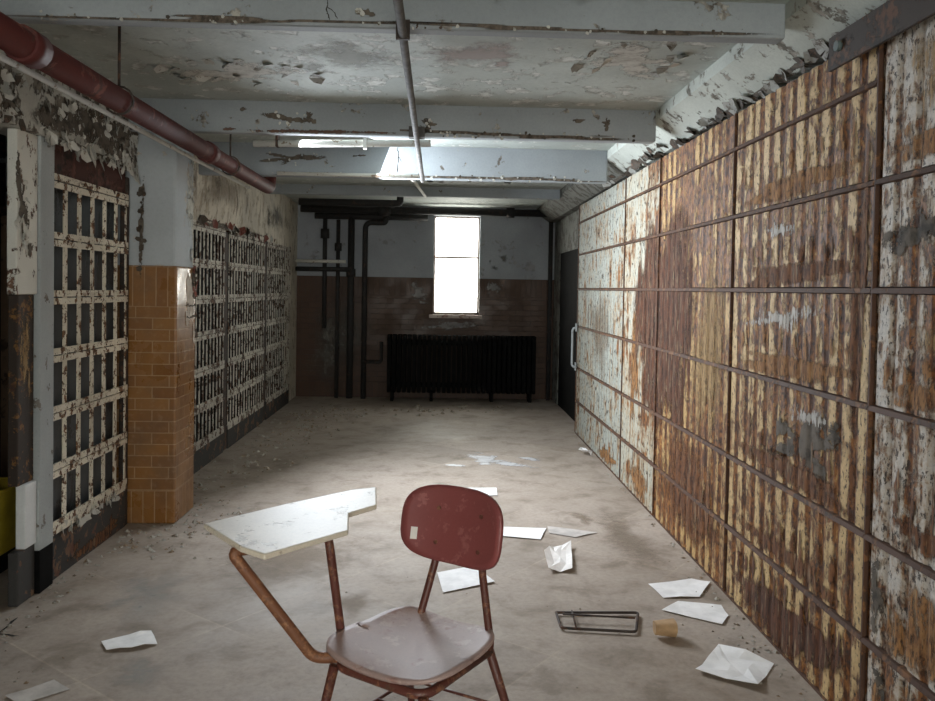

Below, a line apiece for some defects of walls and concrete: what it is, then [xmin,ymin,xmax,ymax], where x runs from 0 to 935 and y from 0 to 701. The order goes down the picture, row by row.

peeling [0,68,147,275]
peeling [262,110,316,126]
peeling [260,152,325,175]
peeling [407,32,839,189]
rust [899,36,935,162]
rust [741,120,869,435]
rust [628,209,725,546]
rust [597,435,616,465]
rust [734,483,852,612]
rust [738,410,855,515]
rust [892,469,935,561]
rust [735,551,841,673]